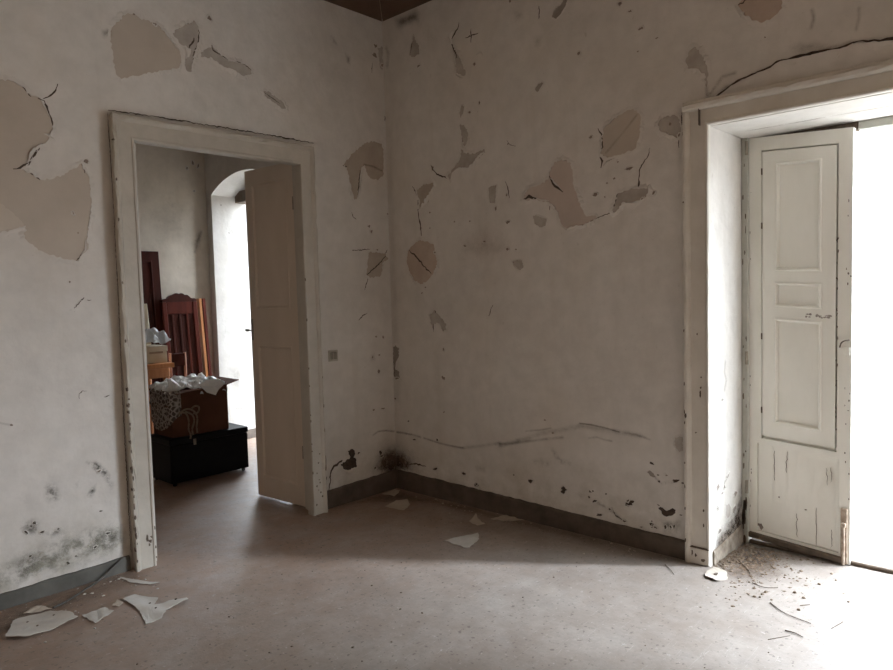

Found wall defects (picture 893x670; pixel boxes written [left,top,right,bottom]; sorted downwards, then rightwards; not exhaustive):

peeling [734,0,788,27]
peeling [104,9,255,83]
crack [716,37,893,96]
peeling [0,74,97,266]
peeling [342,138,386,202]
peeling [404,100,487,294]
peeling [488,105,683,233]
peeling [352,248,390,288]
flaking render [311,444,361,506]
mould [373,449,426,472]
mould [21,530,115,576]
mould [719,504,742,544]